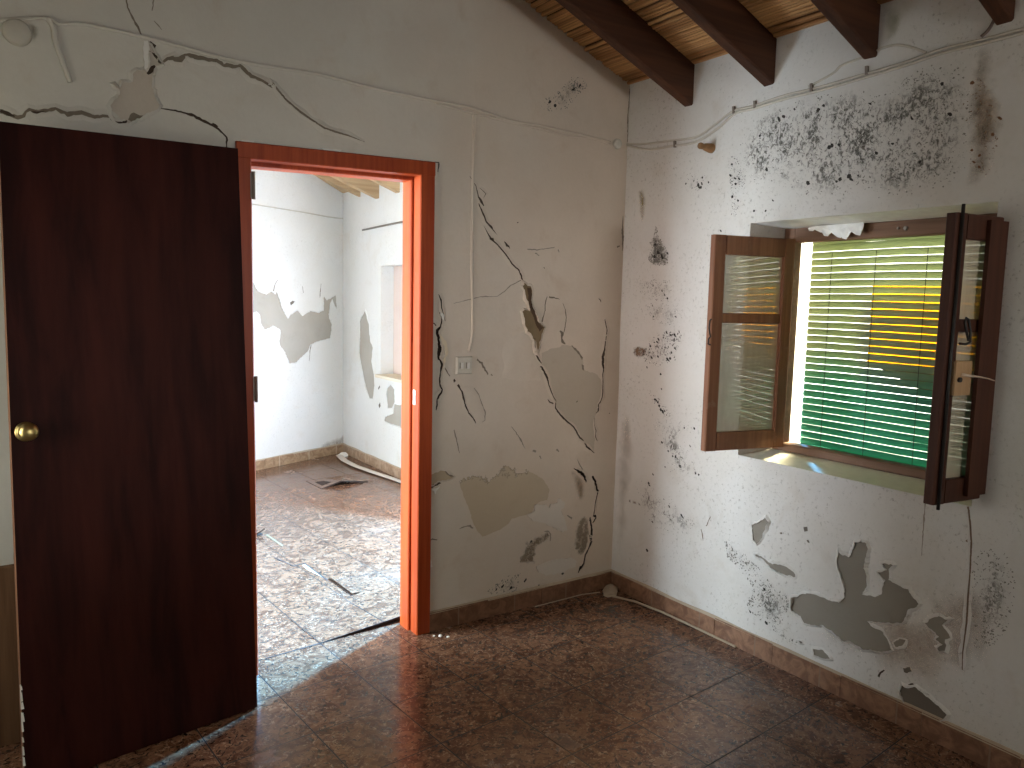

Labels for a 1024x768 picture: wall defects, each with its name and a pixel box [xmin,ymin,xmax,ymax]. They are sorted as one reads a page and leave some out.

crack [0,103,129,130]
crack [126,0,365,147]
leakage [728,64,1002,215]
mould [648,226,669,266]
spalling [253,279,337,364]
spalling [359,310,402,428]
crack [432,175,559,453]
spalling [520,279,546,355]
leakage [634,279,682,375]
crack [511,296,610,574]
mould [726,541,797,644]
spalling [751,514,954,655]